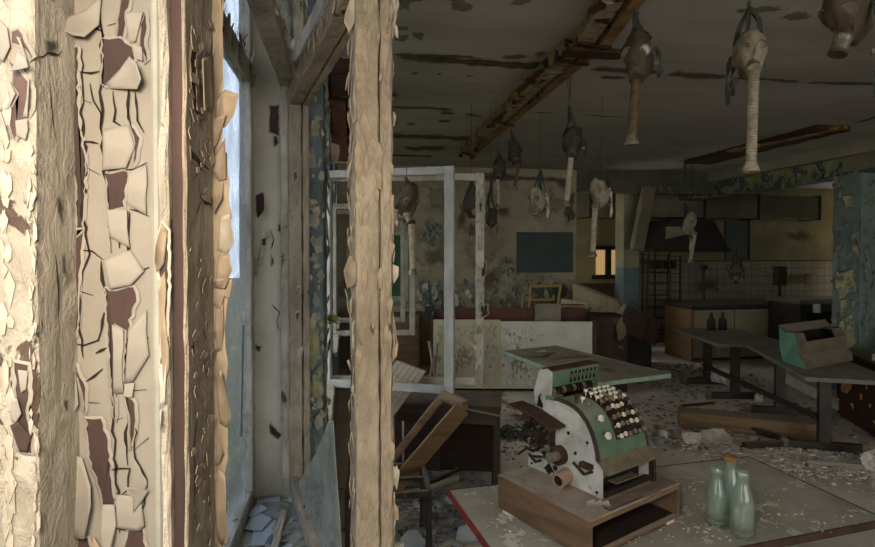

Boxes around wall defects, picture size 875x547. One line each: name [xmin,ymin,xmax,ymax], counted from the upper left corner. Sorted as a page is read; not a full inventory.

peeling [0,20,41,547]
crack [38,14,148,510]
peeling [65,0,151,339]
peeling [74,123,172,547]
peeling [188,0,257,547]
peeling [256,192,264,217]
peeling [255,223,281,277]
peeling [268,104,280,148]
peeling [268,423,282,440]
peeling [295,0,424,547]
water stain [395,52,546,69]
peeling [834,269,858,348]